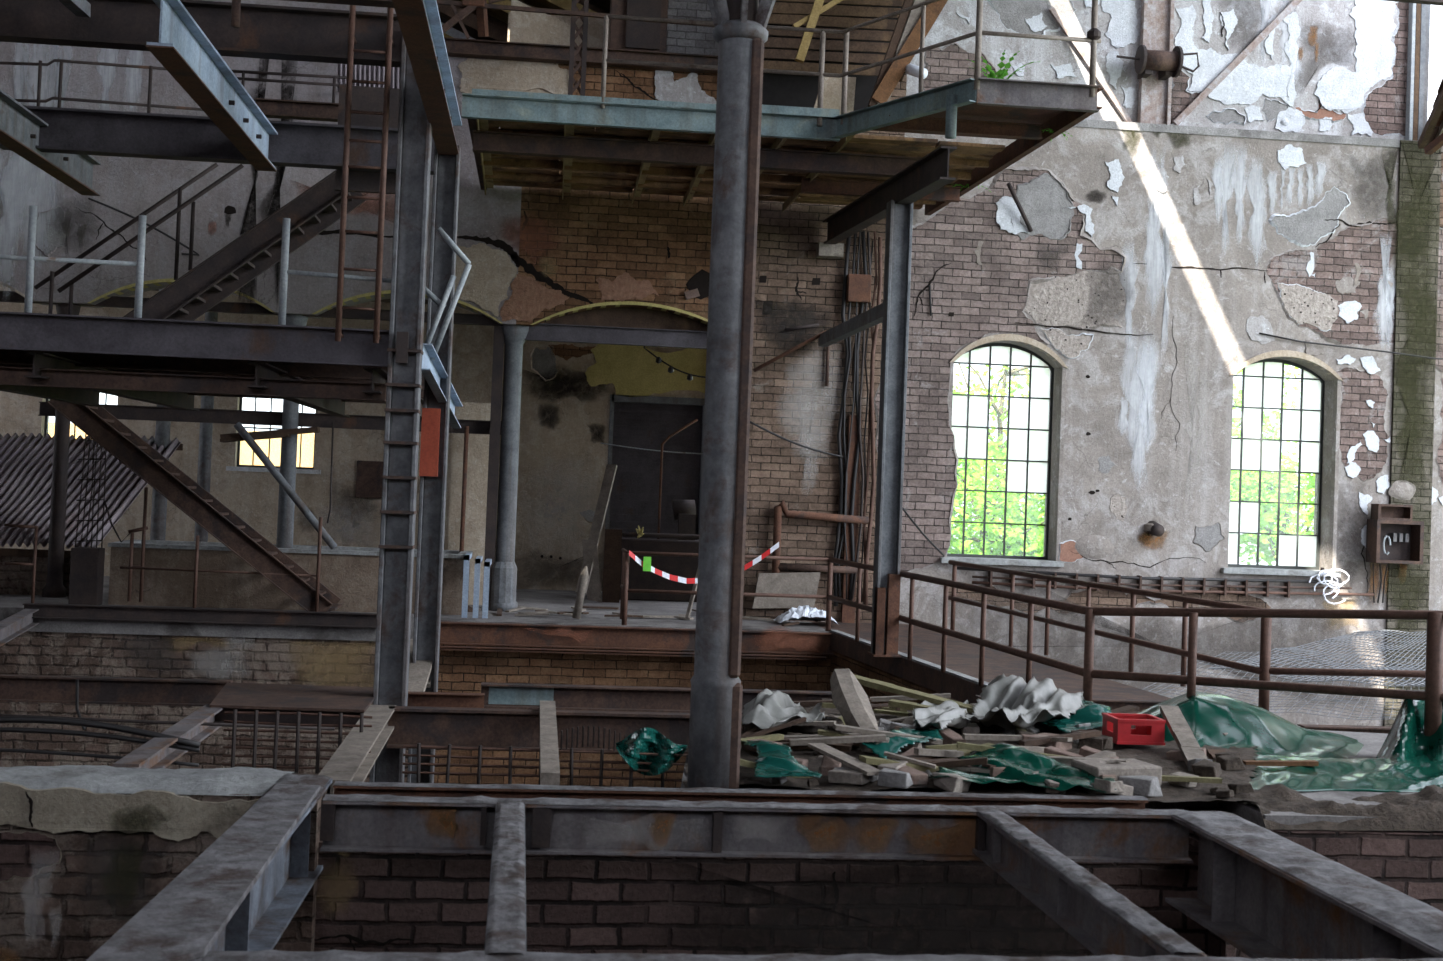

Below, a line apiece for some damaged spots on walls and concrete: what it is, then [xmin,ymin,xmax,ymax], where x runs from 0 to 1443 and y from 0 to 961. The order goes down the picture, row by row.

peeling [1171,0,1409,170]
efflorescence [1214,166,1324,244]
crack [457,211,594,304]
water stain [1097,191,1171,328]
crack [1126,262,1267,283]
flaking render [1435,151,1443,387]
flaking render [900,159,1129,578]
efflorescence [1121,365,1153,461]
flaking render [1246,186,1397,548]
flaking render [1432,406,1443,505]
crack [25,791,33,827]
flaking render [0,830,62,883]